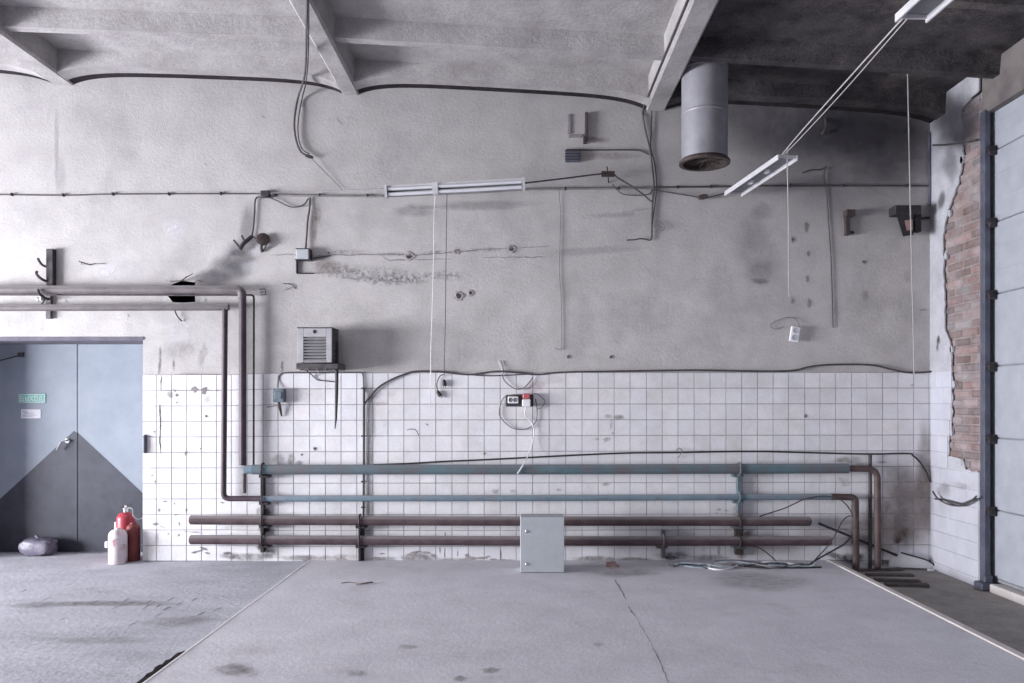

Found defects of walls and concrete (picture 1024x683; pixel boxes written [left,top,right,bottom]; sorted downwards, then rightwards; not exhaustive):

spalling [163,276,201,304]
flaking render [944,93,982,472]
crack [615,580,669,683]